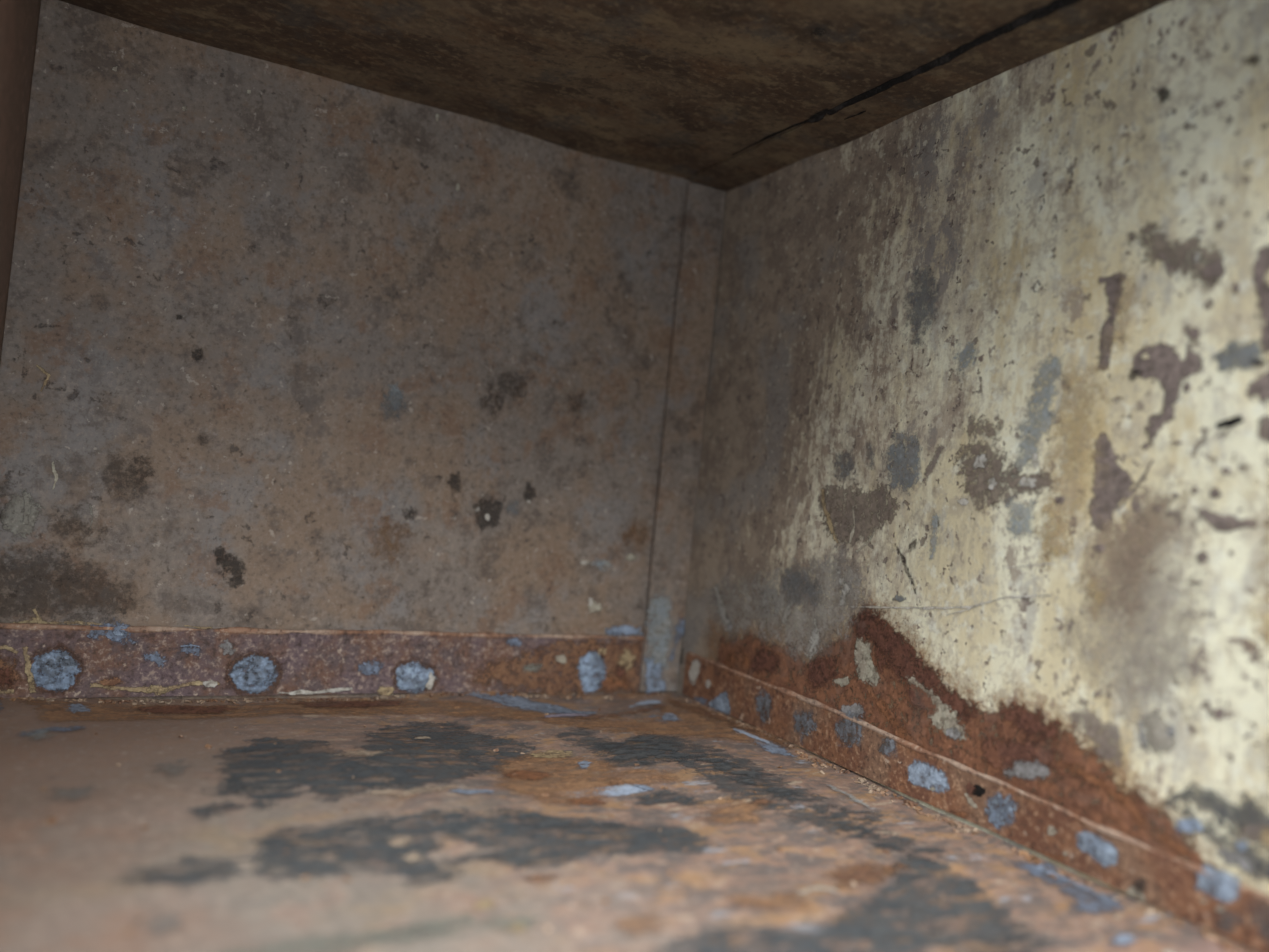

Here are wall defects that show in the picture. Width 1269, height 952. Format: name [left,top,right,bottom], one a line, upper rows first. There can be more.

crack [732,0,1081,155]
peeling [1088,220,1269,552]
spalling [1197,551,1209,565]
rust [0,645,789,747]
leakage [110,721,713,889]
rust [474,634,644,696]
leakage [542,618,1067,952]
rust [707,599,1217,869]
peeling [1071,690,1123,766]
spalling [1213,708,1225,719]
leakage [234,914,541,952]
rust [733,860,907,909]